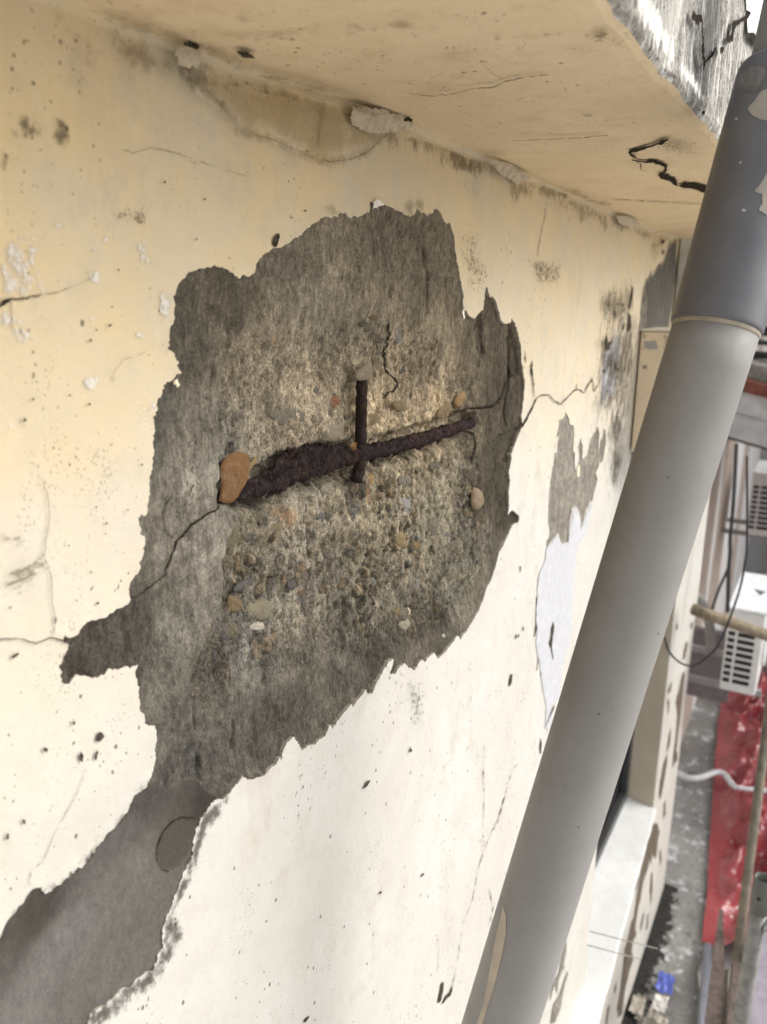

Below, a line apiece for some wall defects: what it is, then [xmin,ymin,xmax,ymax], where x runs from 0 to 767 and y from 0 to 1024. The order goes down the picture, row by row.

peeling [692,9,756,70]
crack [613,139,706,205]
crack [0,278,92,328]
rust [217,379,476,504]
crack [382,323,398,408]
crack [466,335,598,462]
crack [133,485,220,598]
spalling [0,199,523,1024]
peeling [515,413,605,753]